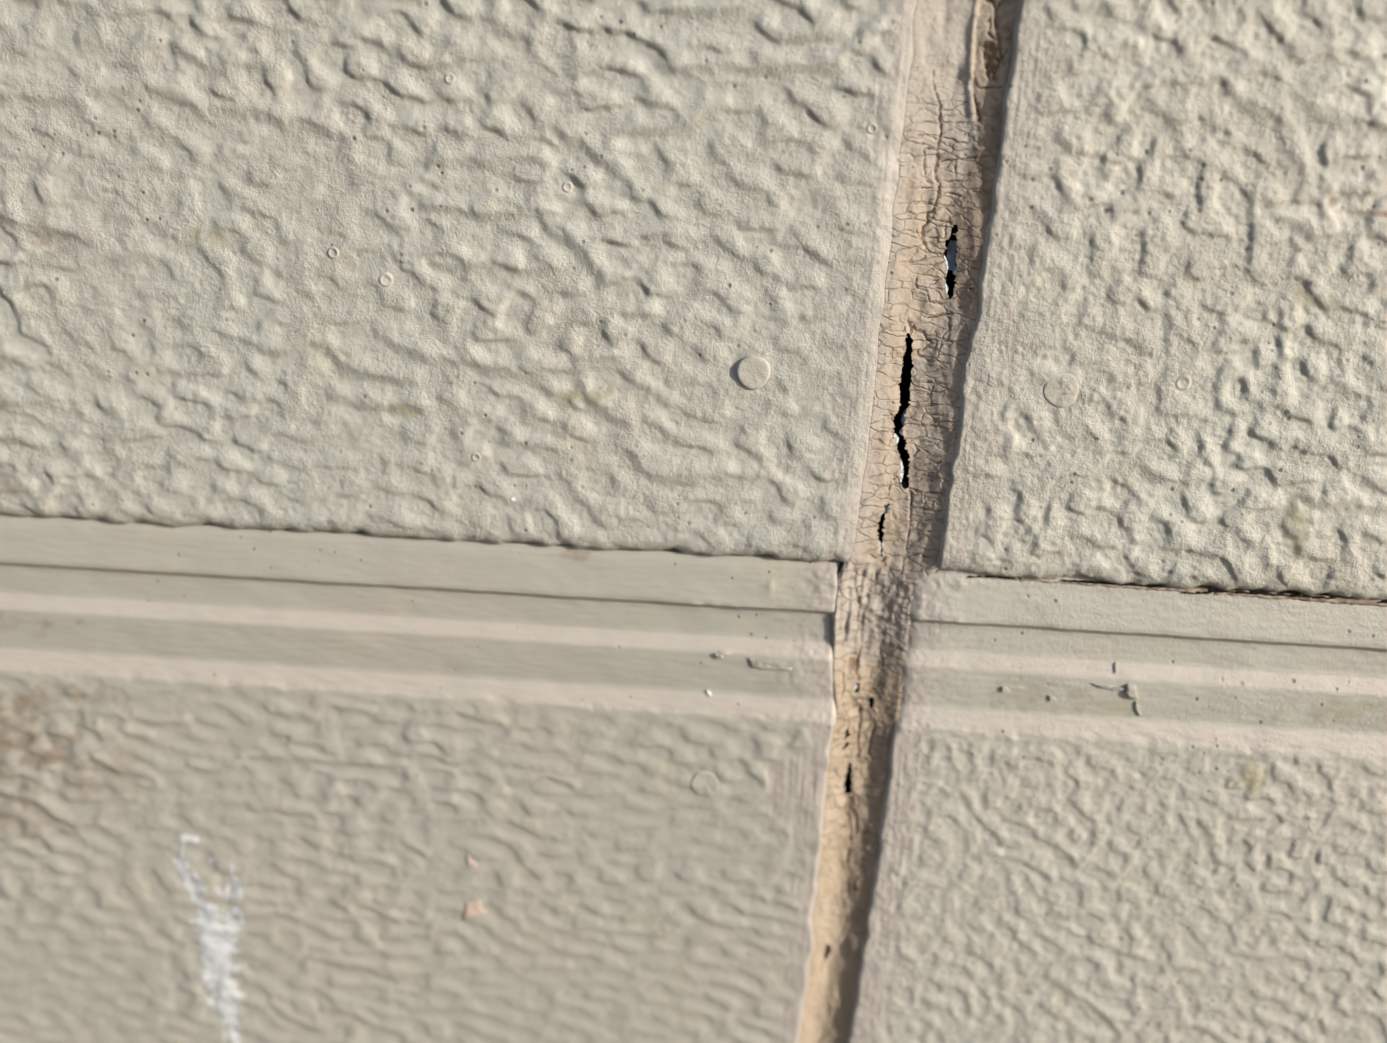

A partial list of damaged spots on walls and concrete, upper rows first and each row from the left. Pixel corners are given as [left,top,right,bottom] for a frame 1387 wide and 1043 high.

leakage [190,857,245,1043]
crack [819,0,1008,1043]